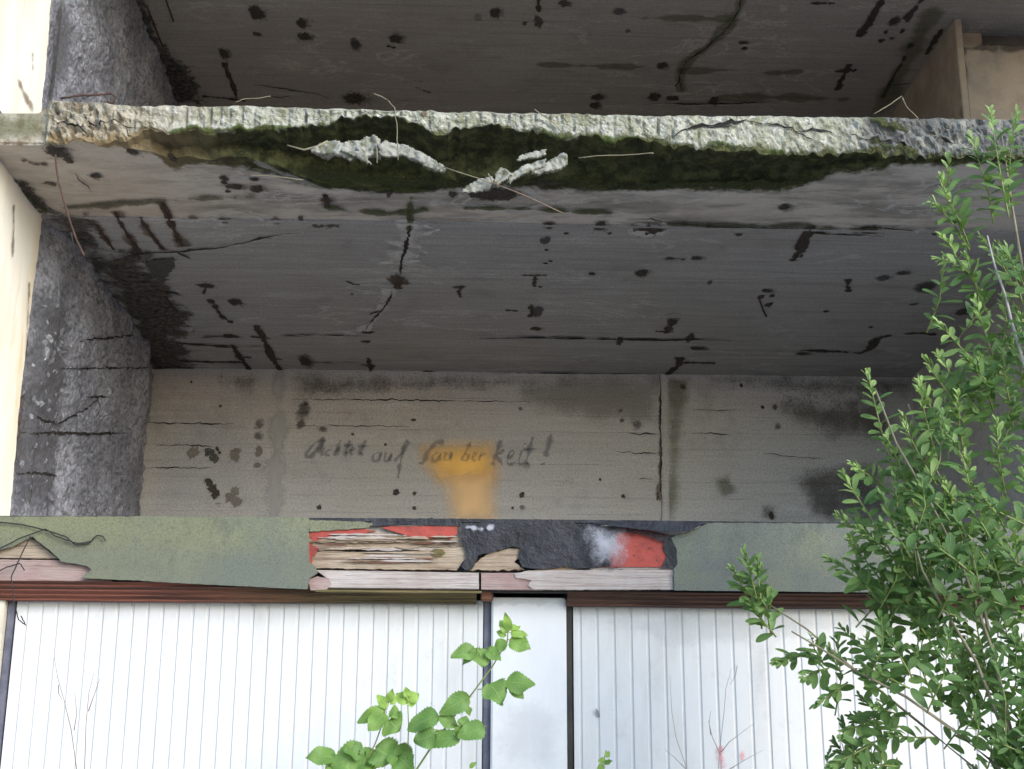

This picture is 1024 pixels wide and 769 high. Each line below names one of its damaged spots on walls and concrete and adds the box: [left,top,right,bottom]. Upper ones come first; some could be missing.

crack [643,1,954,147]
spalling [21,143,101,190]
spalling [219,176,262,193]
spalling [449,188,522,202]
crack [110,233,301,259]
crack [288,226,411,343]
crack [194,334,257,347]
leakage [800,404,888,431]
crack [618,376,663,518]
leakage [807,471,880,515]
peeling [309,518,458,563]
peeling [598,528,666,568]